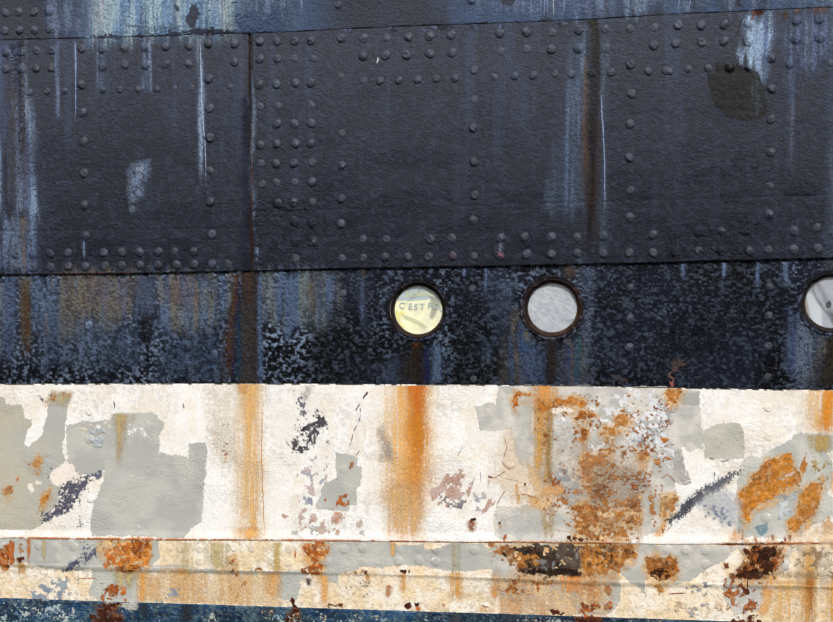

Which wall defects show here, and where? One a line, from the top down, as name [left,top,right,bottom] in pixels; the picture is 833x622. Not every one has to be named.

water stain [0,44,232,380]
water stain [467,0,773,253]
water stain [780,0,833,160]
corrosion [0,38,379,622]
corrosion [386,570,410,596]
corrosion [384,343,442,557]
corrosion [436,541,463,598]
water stain [484,269,545,385]
water stain [556,260,593,385]
corrosion [480,341,684,622]
corrosion [714,337,833,622]
water stain [787,311,826,388]